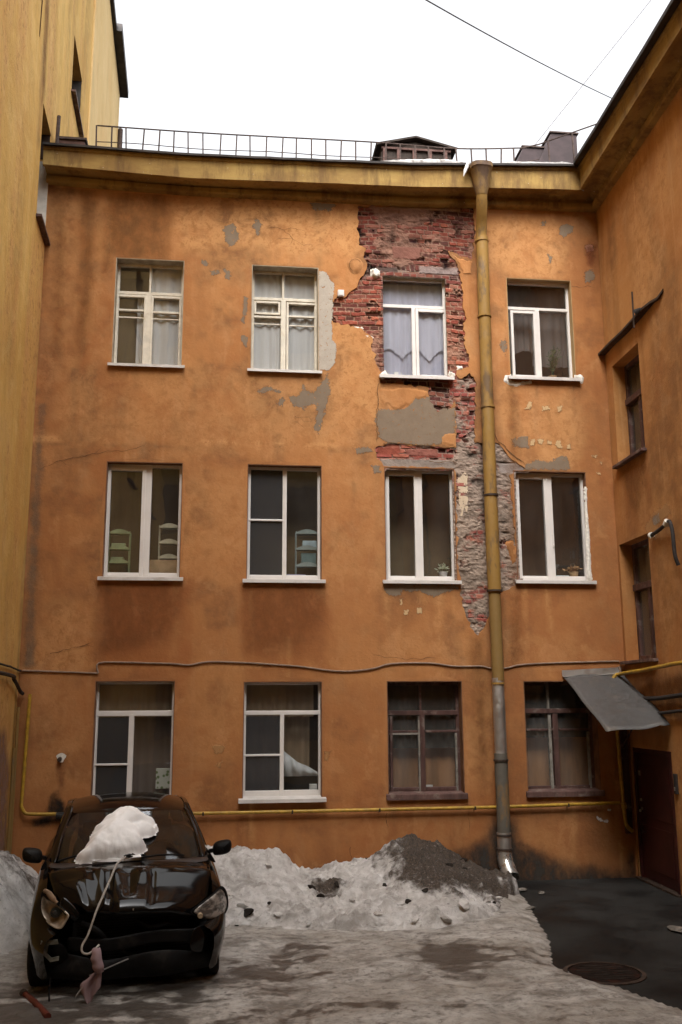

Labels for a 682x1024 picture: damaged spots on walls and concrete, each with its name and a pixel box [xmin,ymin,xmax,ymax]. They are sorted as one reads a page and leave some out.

flaking render [222,223,239,246]
flaking render [257,205,571,635]
water stain [460,823,500,870]
water stain [510,823,636,881]